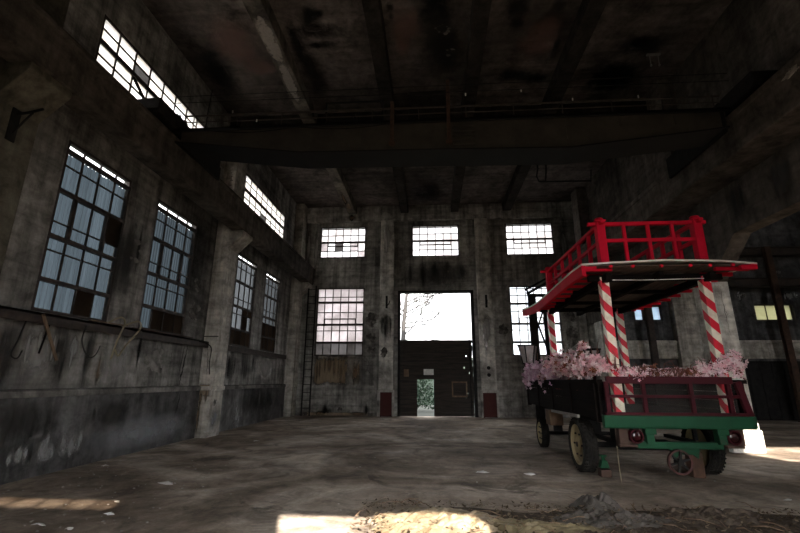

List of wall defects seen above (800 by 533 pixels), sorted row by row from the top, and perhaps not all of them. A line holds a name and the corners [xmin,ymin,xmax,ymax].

damp [288,8,339,95]
damp [24,333,94,380]